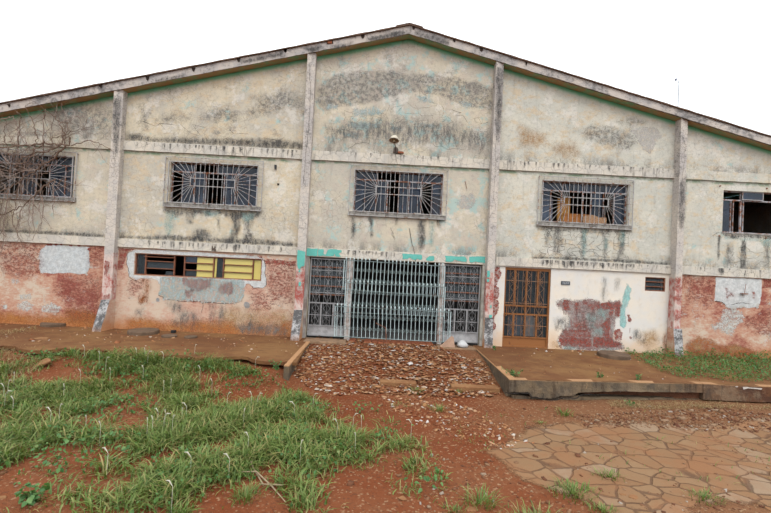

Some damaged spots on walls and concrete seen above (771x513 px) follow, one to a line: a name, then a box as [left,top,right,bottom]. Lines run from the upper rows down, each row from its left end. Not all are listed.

water stain [318,68,504,131]
water stain [332,121,483,149]
peeling [402,253,434,261]
water stain [718,234,771,273]
peeling [0,241,342,313]
peeling [445,256,502,331]
peeling [676,275,715,308]
peeling [557,286,632,351]
peeling [711,301,771,336]